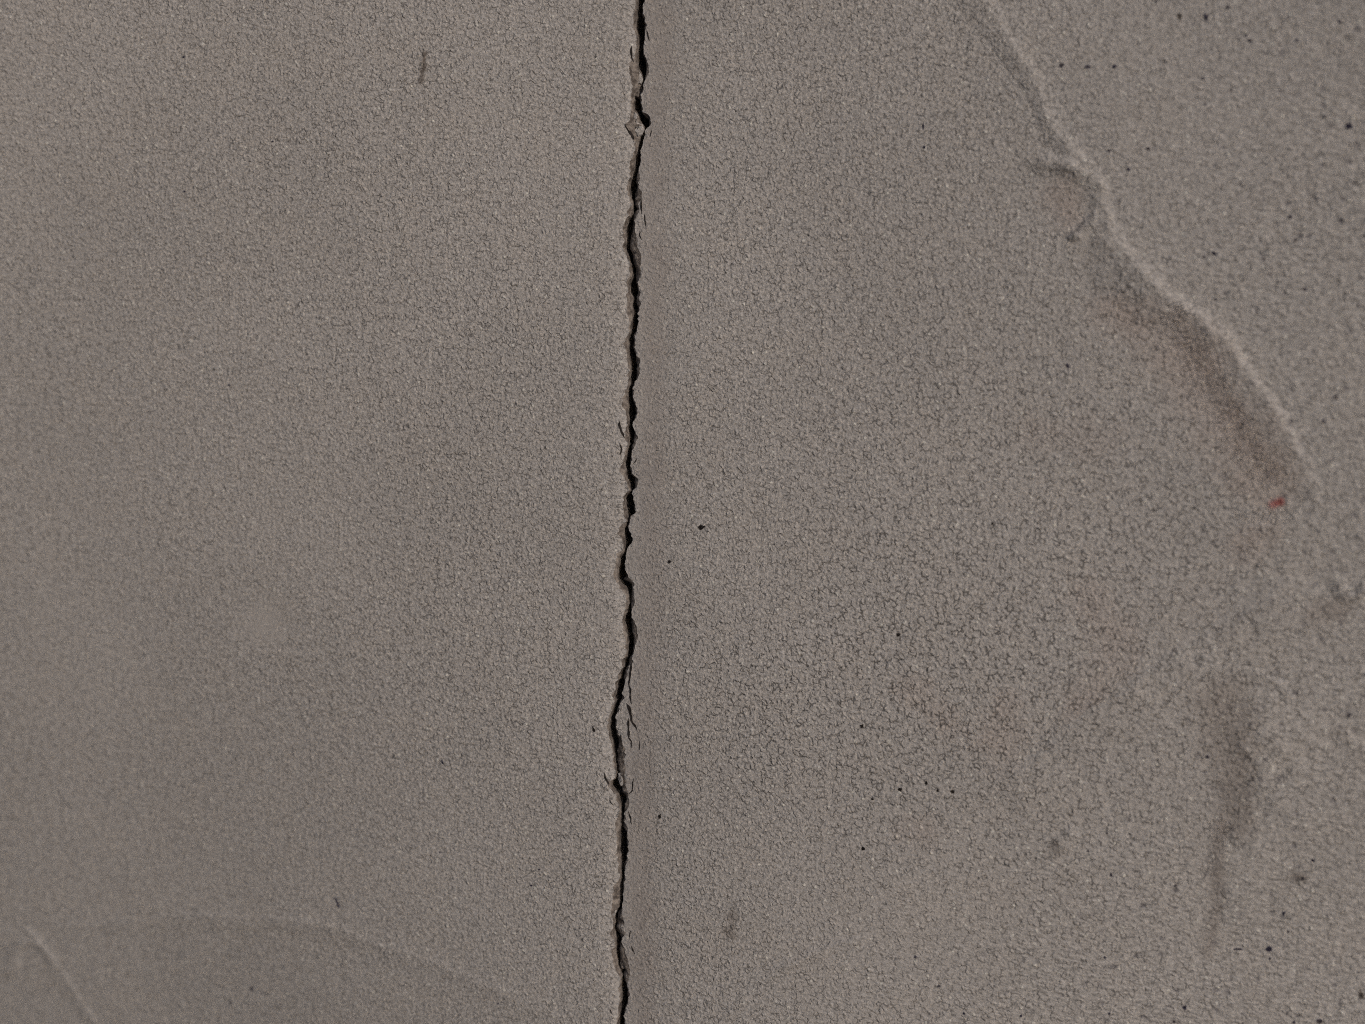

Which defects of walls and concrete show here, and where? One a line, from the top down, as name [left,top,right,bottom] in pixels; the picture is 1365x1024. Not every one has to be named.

crack [604,0,652,1024]